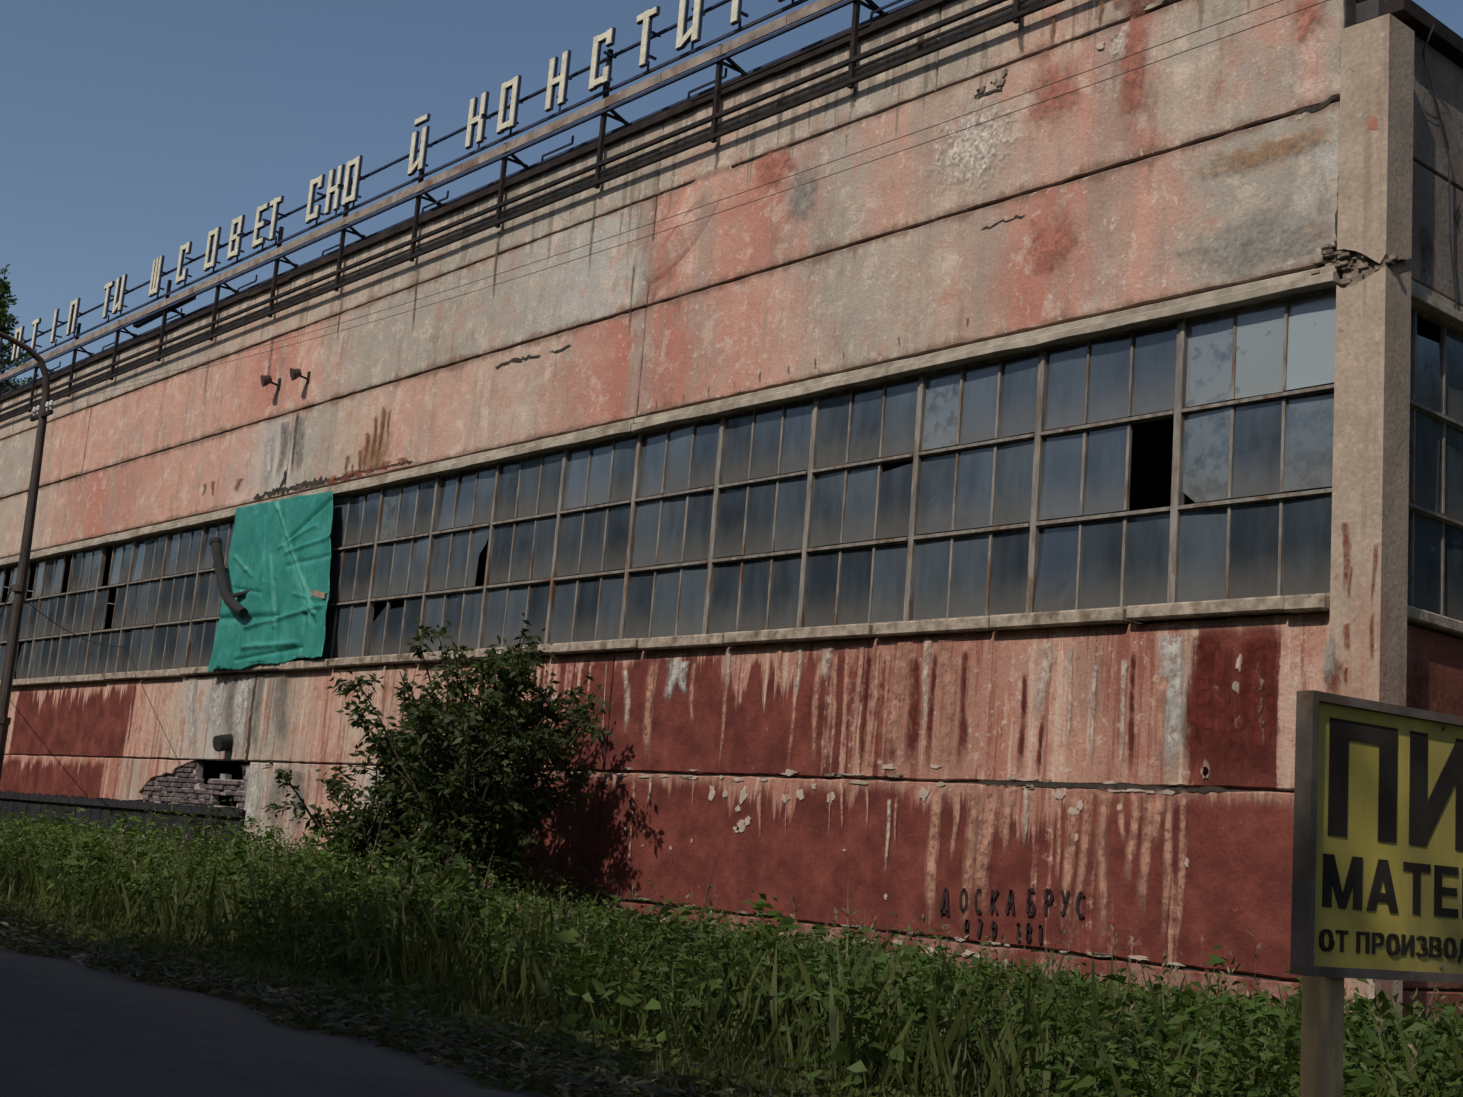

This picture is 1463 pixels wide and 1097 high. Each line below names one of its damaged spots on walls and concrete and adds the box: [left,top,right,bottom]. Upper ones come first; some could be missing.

spalling [1311,240,1399,287]
corrosion [297,407,407,491]
damp [602,658,696,744]
damp [777,636,967,754]
damp [1120,655,1135,760]
damp [1157,633,1277,762]
flaking render [140,763,248,810]
peeling [616,767,869,833]
peeling [918,764,946,802]
spalling [978,759,1226,815]
damp [926,785,1028,914]
damp [1056,790,1186,934]